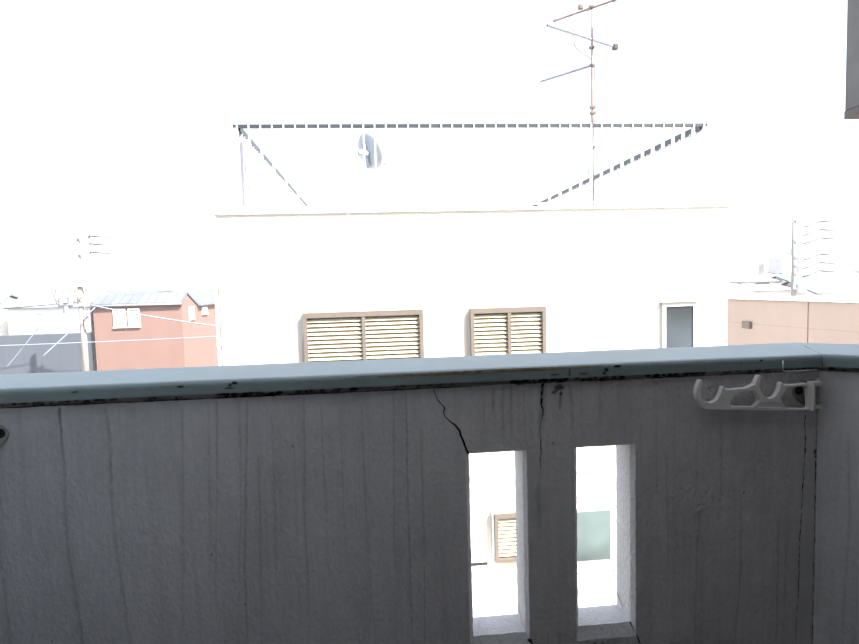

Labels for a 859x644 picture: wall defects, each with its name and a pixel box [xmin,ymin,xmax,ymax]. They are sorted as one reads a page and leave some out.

crack [434,390,470,454]